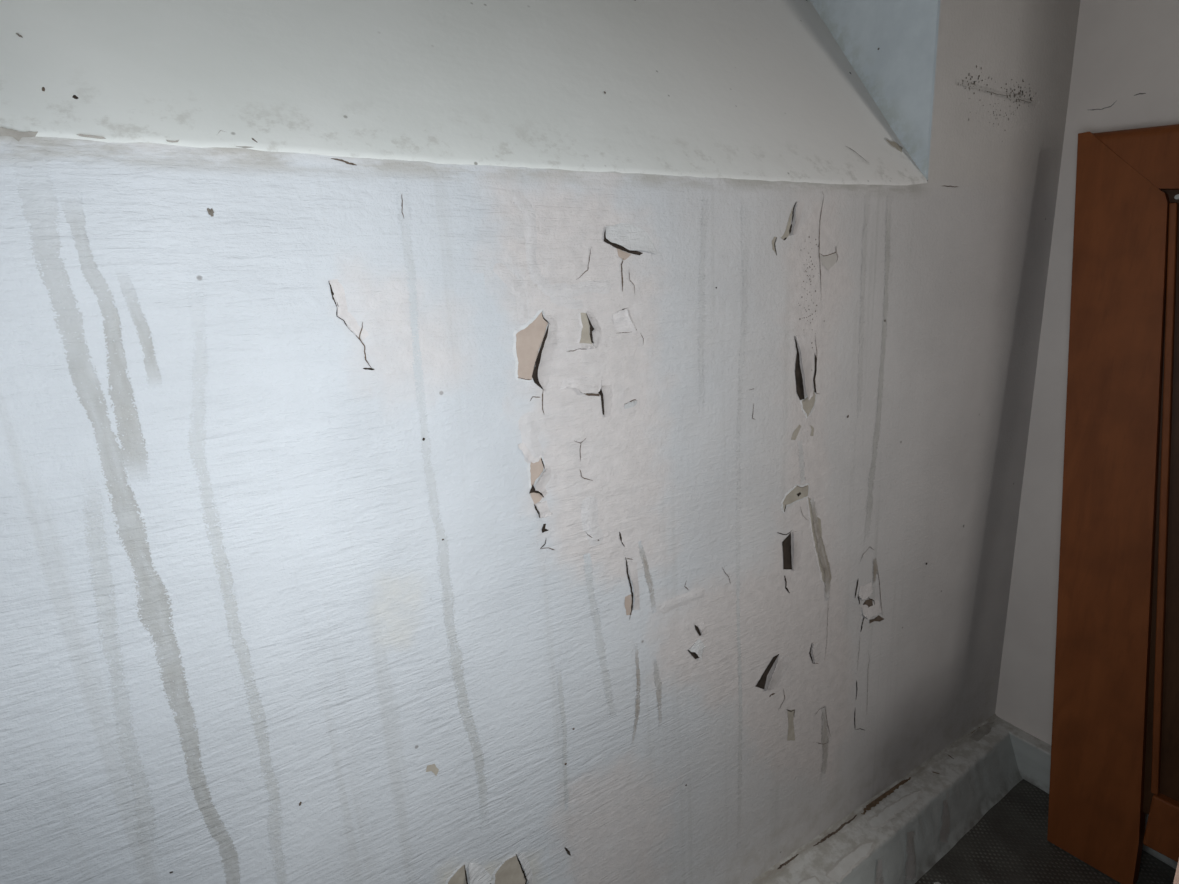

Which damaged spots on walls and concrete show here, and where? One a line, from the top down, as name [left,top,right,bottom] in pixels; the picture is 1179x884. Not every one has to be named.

peeling [604,223,657,293]
crack [328,279,375,370]
peeling [513,309,644,417]
peeling [791,335,819,440]
damp [11,147,240,884]
damp [186,271,287,884]
peeling [518,442,554,550]
damp [296,166,892,884]
peeling [777,483,832,601]
peeling [855,547,884,630]
peeling [755,654,795,741]
peeling [446,852,533,884]